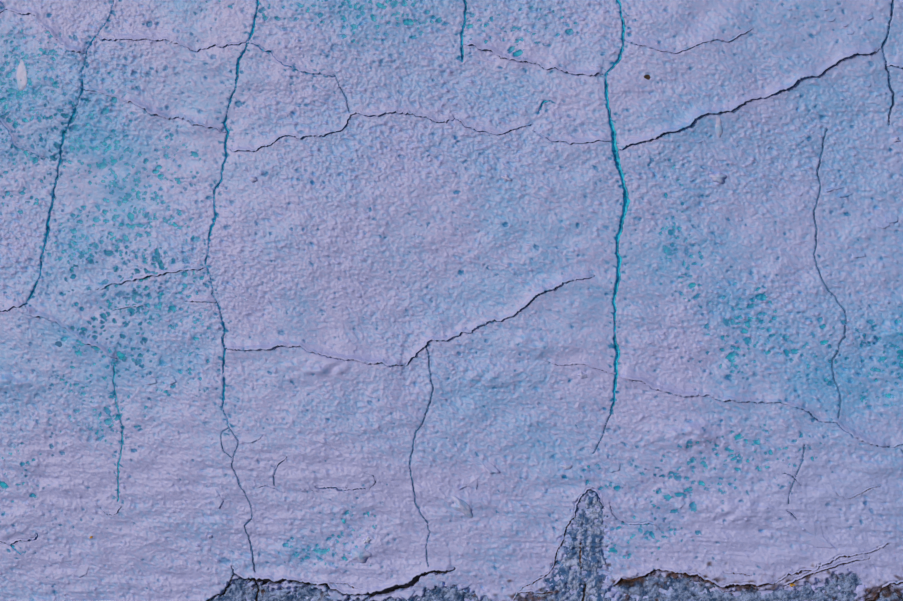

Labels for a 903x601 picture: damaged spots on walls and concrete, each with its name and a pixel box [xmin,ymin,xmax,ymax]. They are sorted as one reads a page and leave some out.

crack [460,0,903,454]
crack [0,0,594,601]
crack [783,445,805,519]
flaking render [208,578,333,601]
flaking render [345,581,493,601]
crack [512,487,663,601]
flaking render [526,488,903,601]
crack [611,542,890,593]
crack [872,580,903,601]